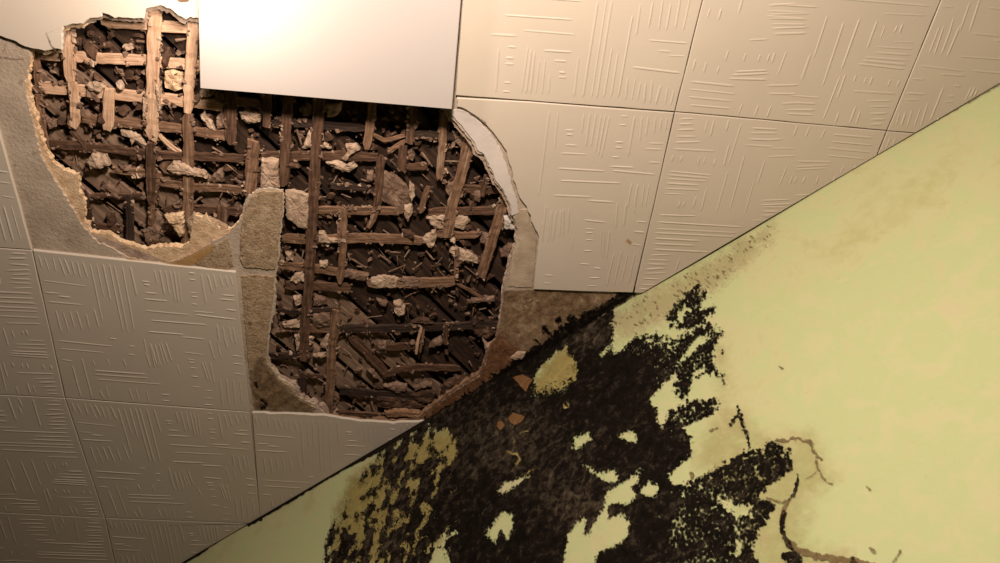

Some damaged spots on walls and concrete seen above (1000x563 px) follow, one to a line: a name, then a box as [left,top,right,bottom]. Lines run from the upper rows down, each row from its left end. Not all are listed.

flaking render [26,6,537,421]
damp [322,254,875,563]